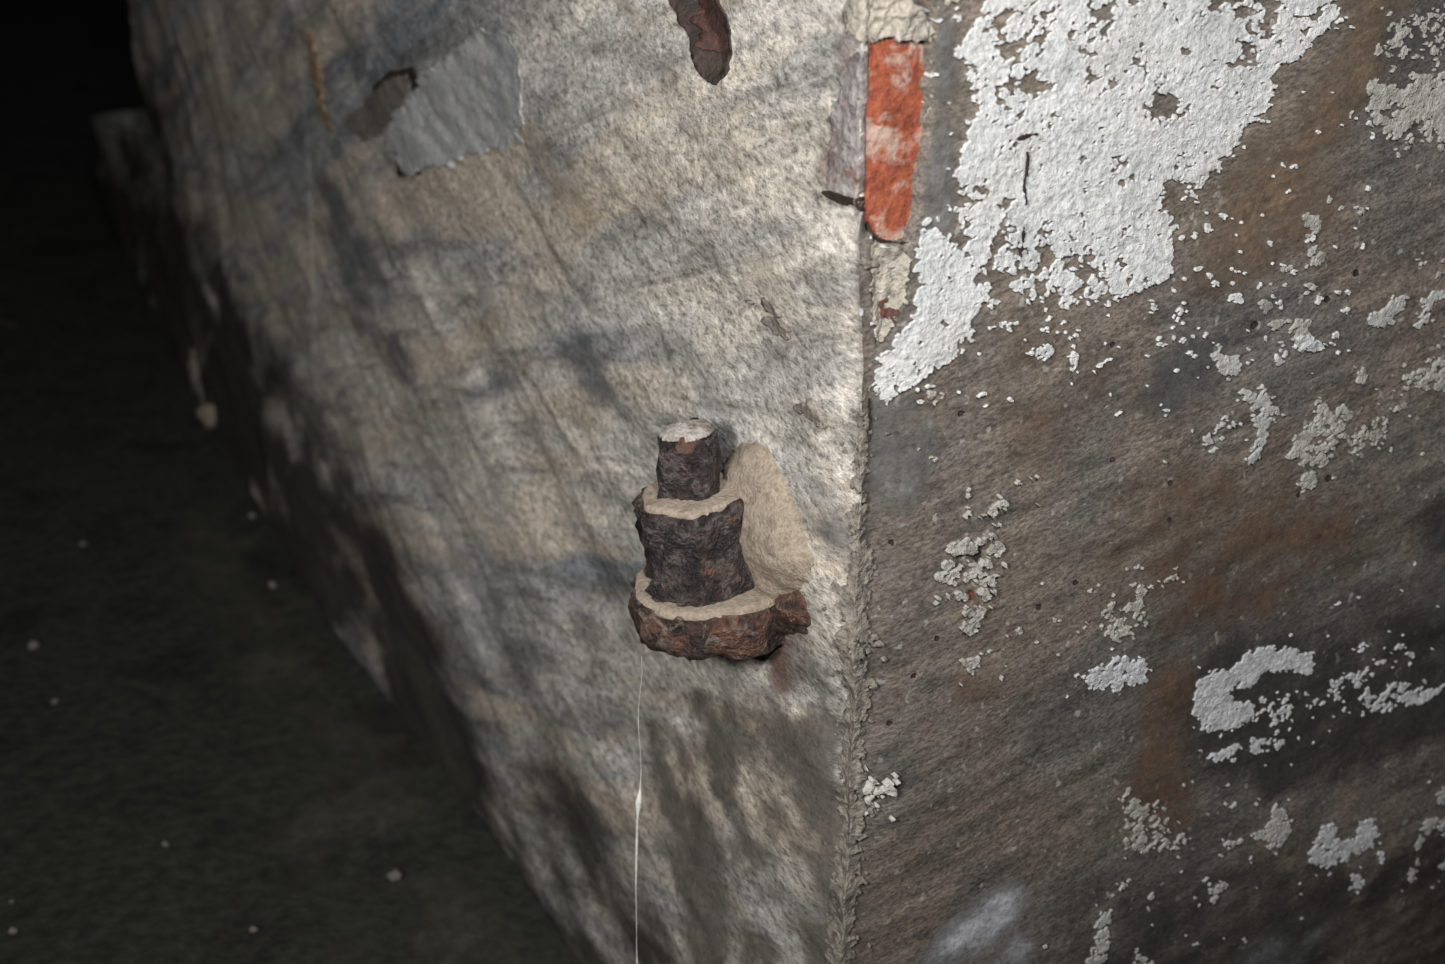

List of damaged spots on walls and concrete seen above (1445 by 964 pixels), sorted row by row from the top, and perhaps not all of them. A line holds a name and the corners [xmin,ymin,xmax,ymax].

spalling [669,0,733,85]
peeling [821,0,1445,506]
peeling [793,398,828,428]
peeling [1074,647,1152,694]
peeling [1191,630,1445,767]
flaking render [862,765,901,822]
peeling [1085,878,1132,964]
peeling [1118,786,1192,873]
peeling [1193,876,1229,907]
peeling [1218,798,1294,864]
peeling [1298,818,1385,895]
peeling [1401,780,1445,893]